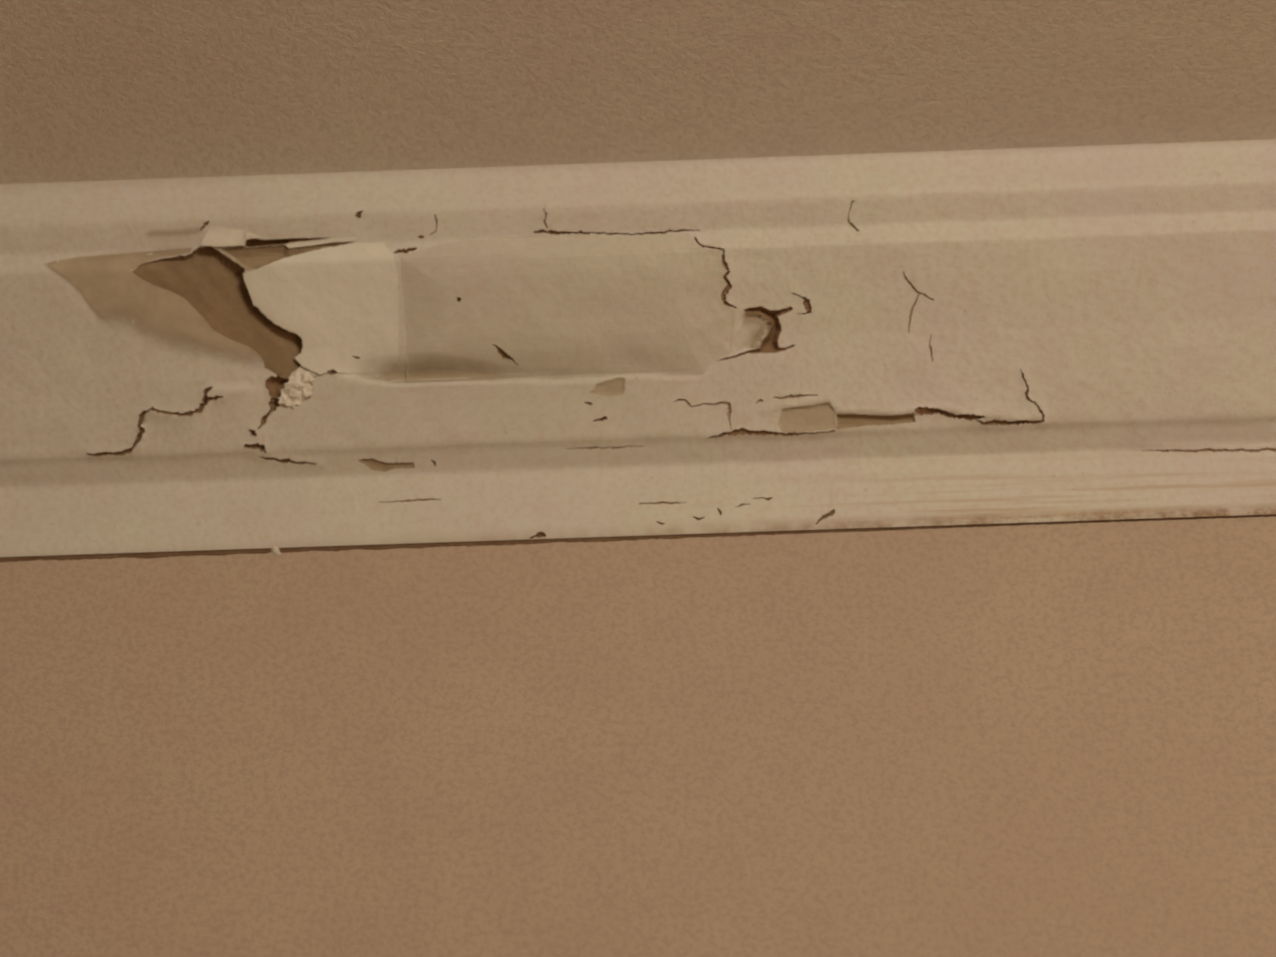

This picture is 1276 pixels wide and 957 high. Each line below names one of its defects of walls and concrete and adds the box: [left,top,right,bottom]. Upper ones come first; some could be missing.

crack [534,208,737,308]
peeling [48,226,399,409]
crack [792,293,812,315]
crack [903,271,934,362]
crack [87,387,223,457]
crack [244,373,317,465]
crack [674,394,835,438]
peeling [778,403,916,433]
crack [915,371,1045,426]
spalling [358,458,415,472]